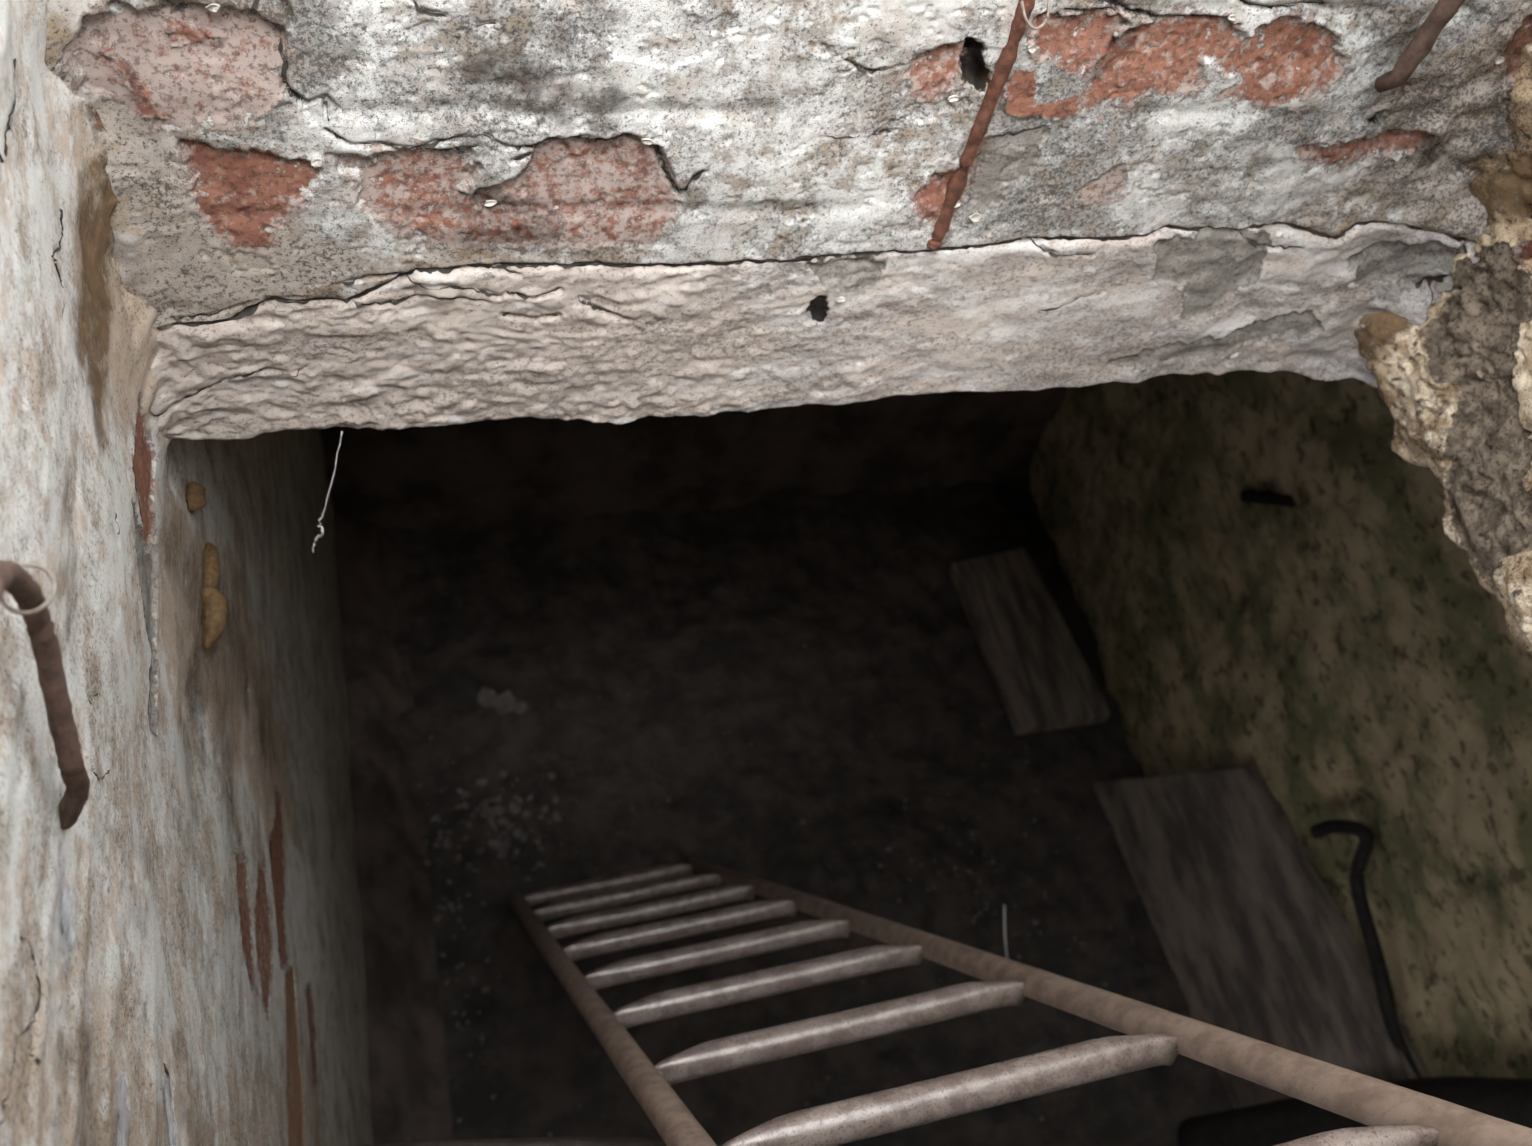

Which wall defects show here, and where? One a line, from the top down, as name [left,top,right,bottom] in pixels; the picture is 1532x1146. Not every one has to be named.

spalling [47,0,693,259]
rust [927,0,1051,250]
spalling [910,1,1357,227]
rust [1374,0,1466,93]
spalling [1494,14,1532,92]
crack [157,221,1472,330]
peeling [1346,237,1532,598]
peeling [128,392,162,737]
peeling [235,785,318,1146]